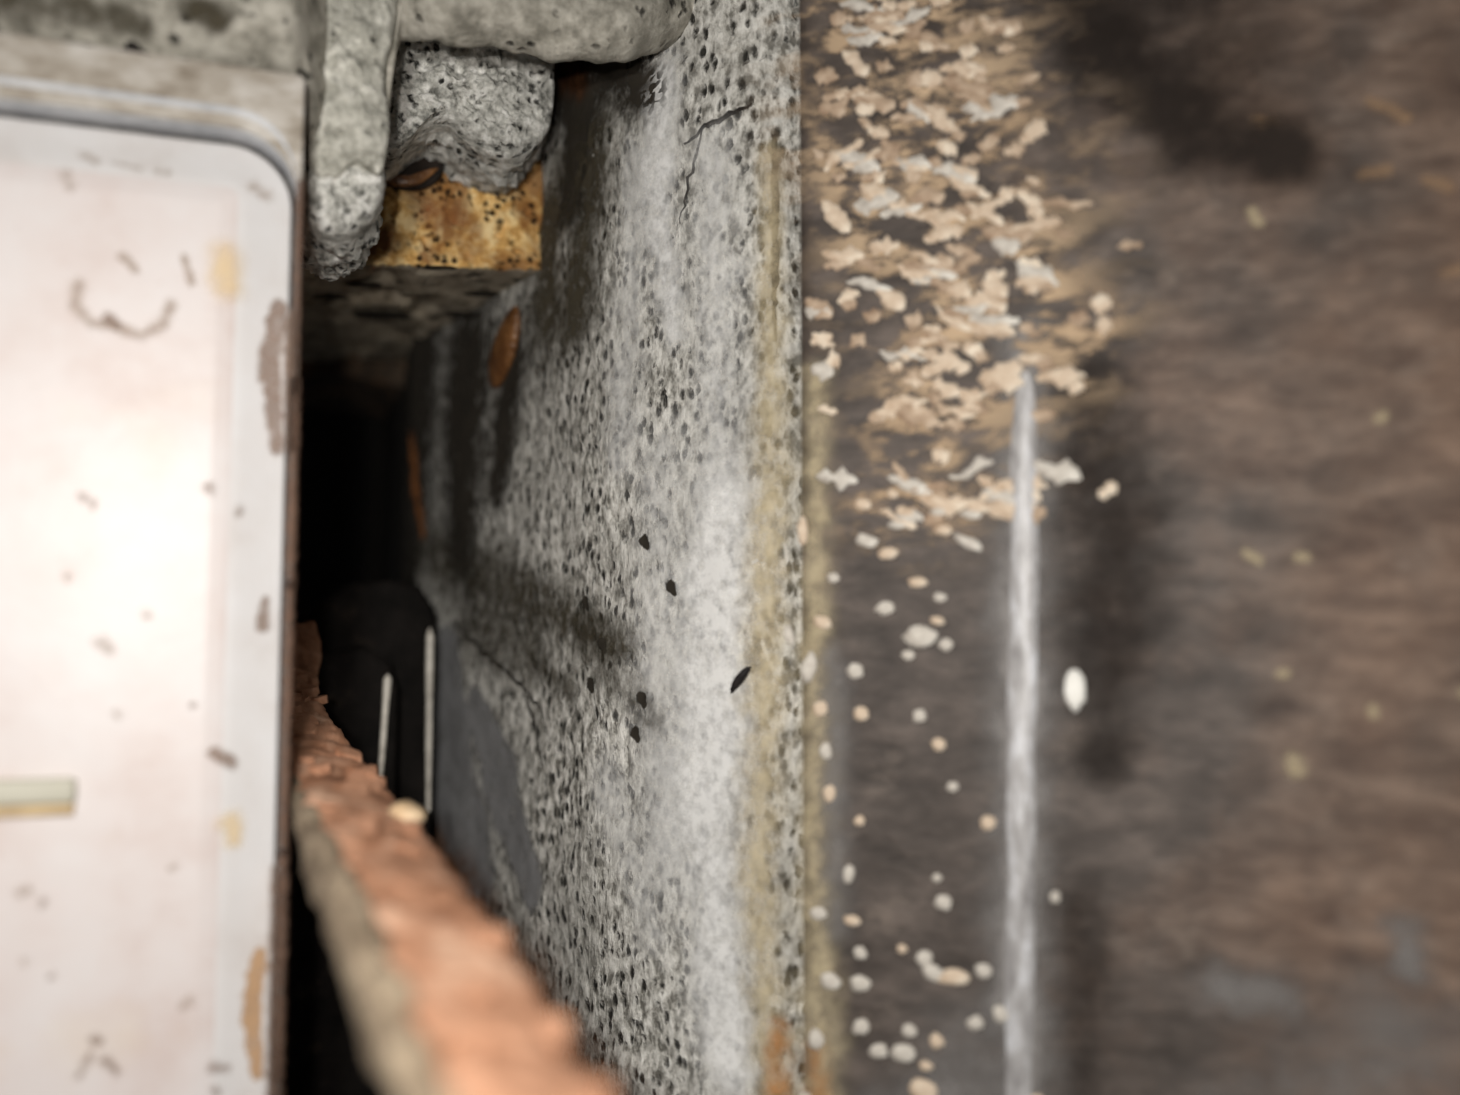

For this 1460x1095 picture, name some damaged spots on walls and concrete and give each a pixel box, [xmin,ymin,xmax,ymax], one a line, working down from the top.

corrosion [241,180,616,1095]
leakage [363,57,872,1095]
leakage [855,521,907,559]
leakage [875,601,895,616]
leakage [901,577,954,661]
leakage [930,508,982,552]
leakage [1064,364,1142,709]
crack [451,621,543,765]
leakage [932,873,953,911]
leakage [897,943,992,985]
leakage [852,1018,985,1095]
leakage [966,1005,1008,1031]